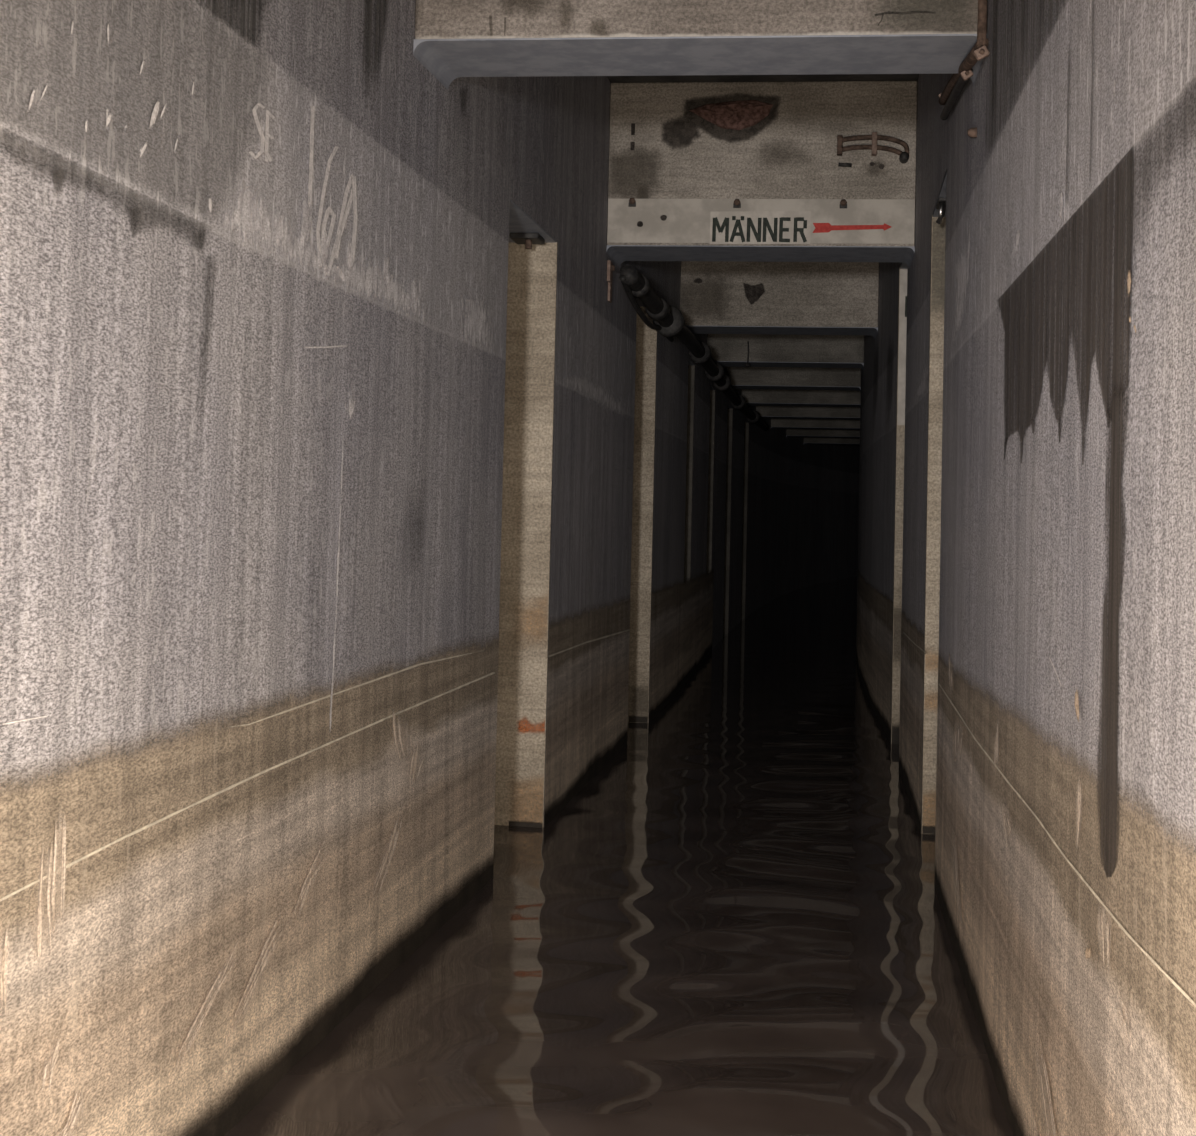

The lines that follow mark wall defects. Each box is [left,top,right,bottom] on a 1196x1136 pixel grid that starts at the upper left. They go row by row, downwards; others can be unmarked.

water stain [150,102,166,127]
water stain [8,137,104,193]
water stain [209,184,424,320]
water stain [856,96,1196,1136]
rust [518,719,545,733]